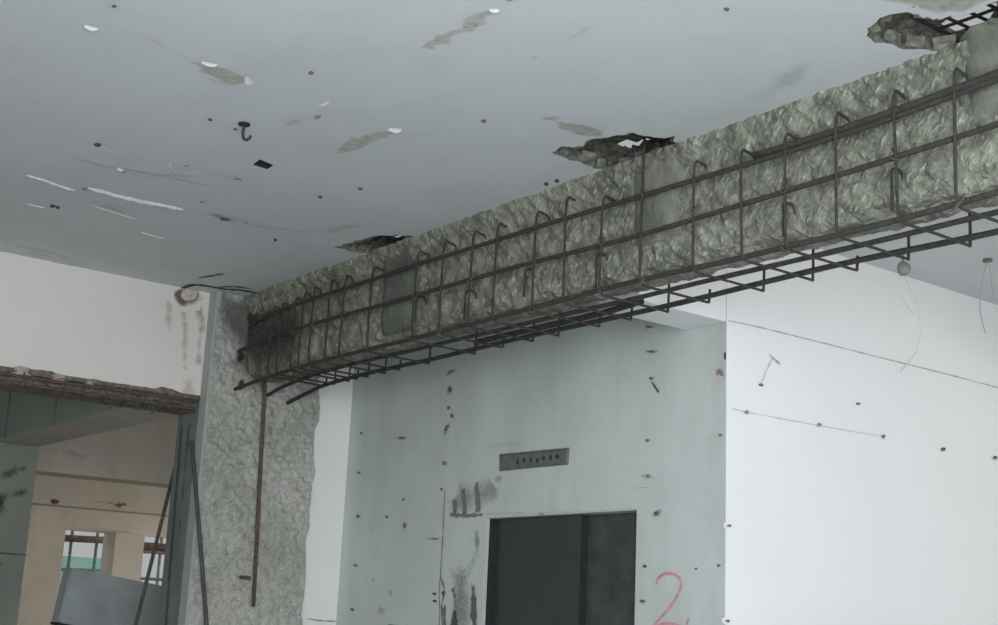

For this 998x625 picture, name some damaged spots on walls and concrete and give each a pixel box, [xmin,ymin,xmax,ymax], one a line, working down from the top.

spalling [867,0,998,52]
peeling [183,58,254,88]
peeling [329,127,404,155]
spalling [534,113,676,169]
spalling [335,235,412,254]
water stain [160,293,209,395]
spalling [642,322,657,332]
spalling [0,366,200,415]
spalling [239,380,267,607]
water stain [437,434,533,625]